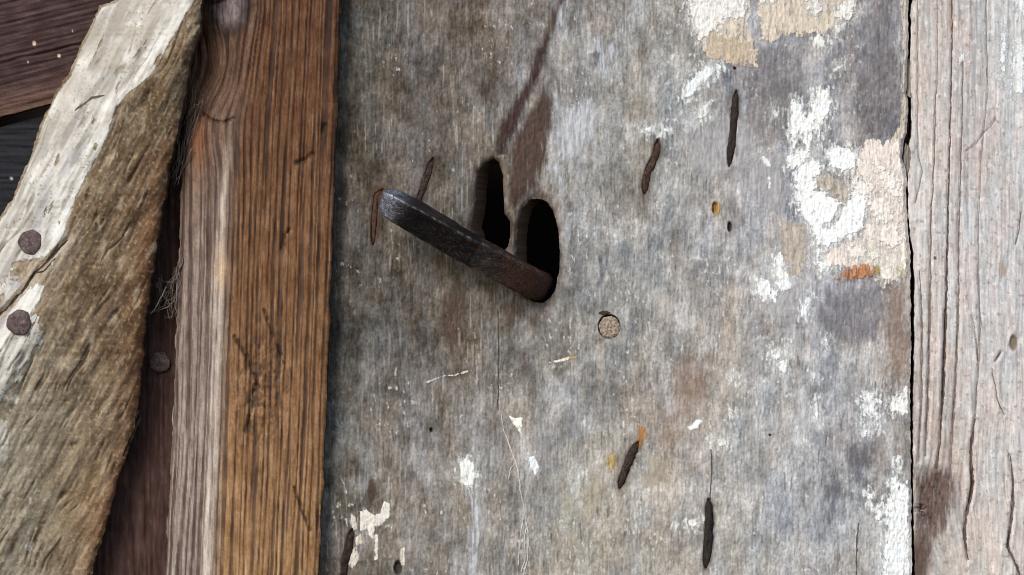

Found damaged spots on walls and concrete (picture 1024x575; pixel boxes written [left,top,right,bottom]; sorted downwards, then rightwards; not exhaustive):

rust [497,0,564,207]
peeling [634,119,674,143]
peeling [676,0,908,289]
rust [835,263,880,281]
crack [915,0,1005,560]
peeling [340,501,391,573]
crack [1007,456,1020,575]